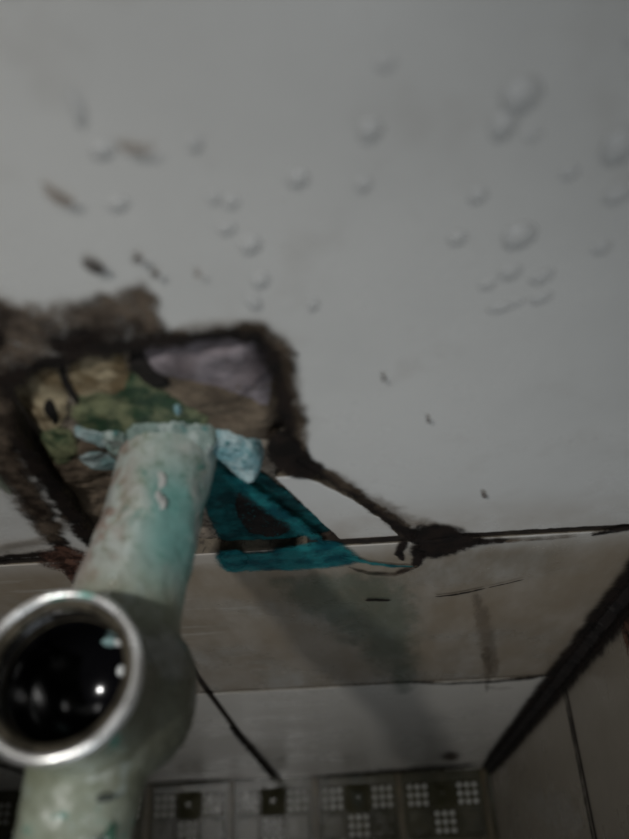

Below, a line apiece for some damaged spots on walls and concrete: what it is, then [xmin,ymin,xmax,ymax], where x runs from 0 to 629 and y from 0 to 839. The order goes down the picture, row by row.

damp [82,259,105,274]
damp [0,286,317,562]
spalling [10,338,330,541]
rust [39,546,84,584]
crack [297,457,425,576]